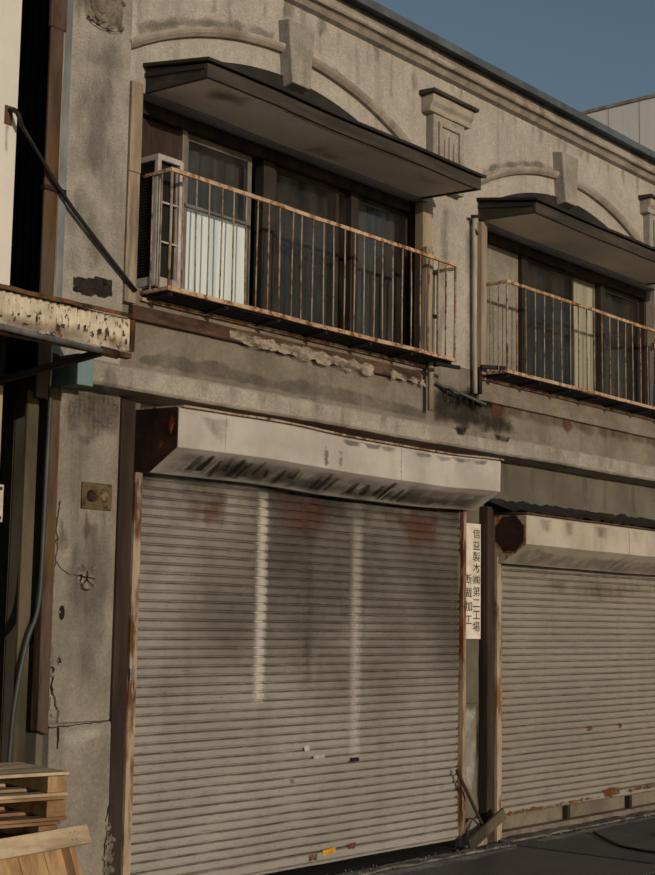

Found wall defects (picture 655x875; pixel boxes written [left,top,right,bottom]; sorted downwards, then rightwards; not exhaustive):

peeling [229,330,374,376]
damp [435,391,510,431]
corrosion [604,785,654,797]